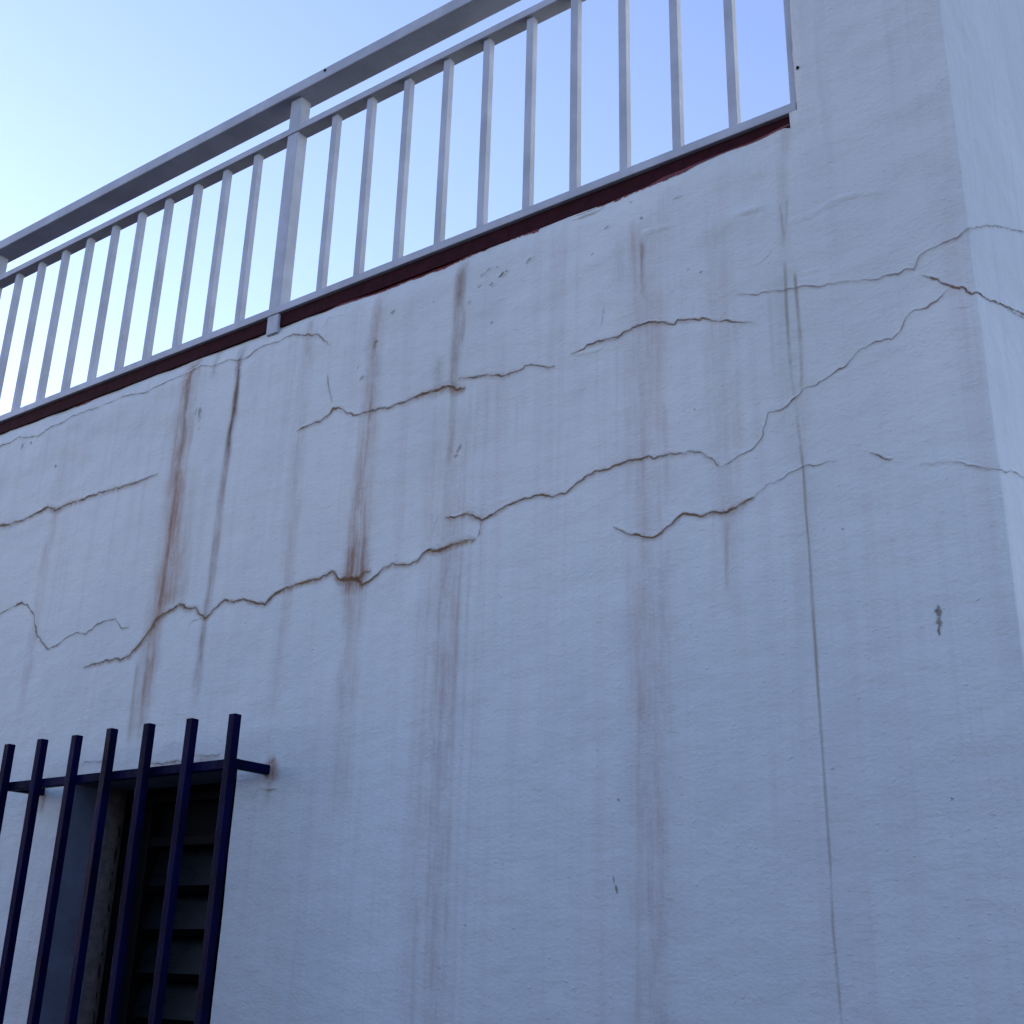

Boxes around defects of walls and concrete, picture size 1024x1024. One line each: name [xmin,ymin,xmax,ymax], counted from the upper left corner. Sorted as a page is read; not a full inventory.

crack [0,273,1024,667]